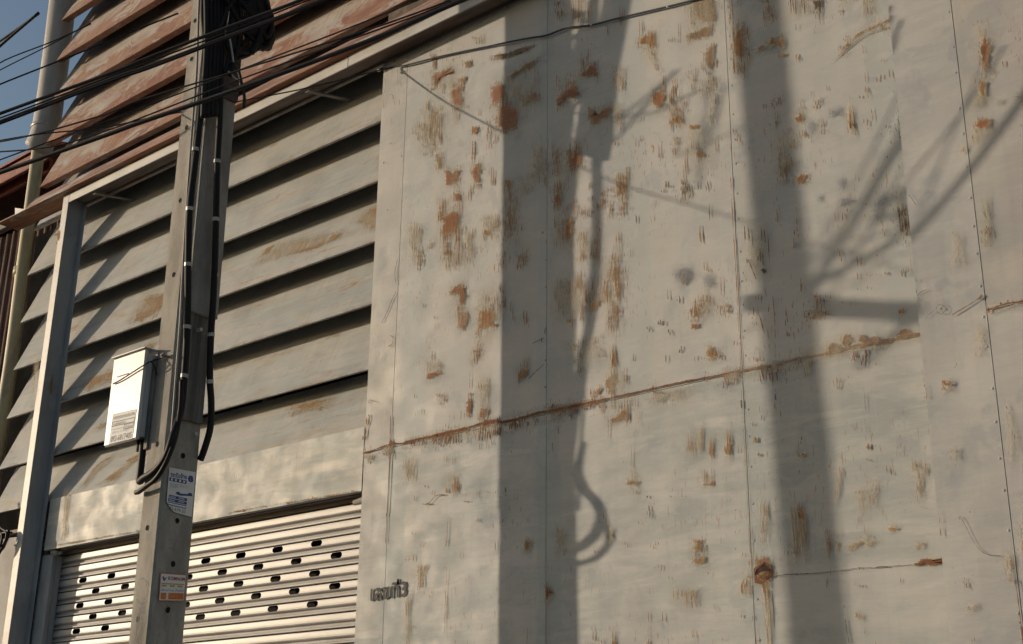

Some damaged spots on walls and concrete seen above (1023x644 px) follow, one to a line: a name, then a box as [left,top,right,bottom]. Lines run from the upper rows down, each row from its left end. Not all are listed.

corrosion [489,44,535,61]
corrosion [361,138,920,543]
corrosion [735,485,884,644]